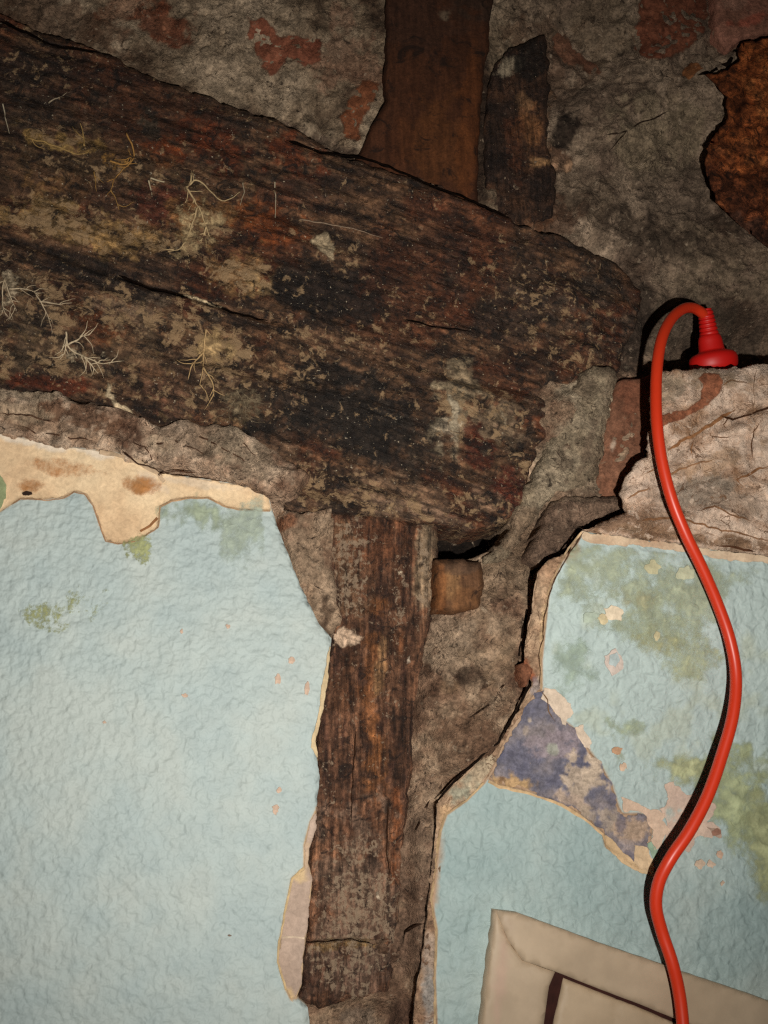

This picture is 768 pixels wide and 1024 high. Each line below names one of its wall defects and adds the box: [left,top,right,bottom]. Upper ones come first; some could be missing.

flaking render [0,434,271,544]
damp [127,478,155,495]
crack [620,369,768,552]
damp [557,545,734,680]
flaking render [304,647,331,757]
crack [391,531,585,1024]
peeling [413,531,768,1024]
damp [657,734,768,899]
flaking render [277,814,317,999]